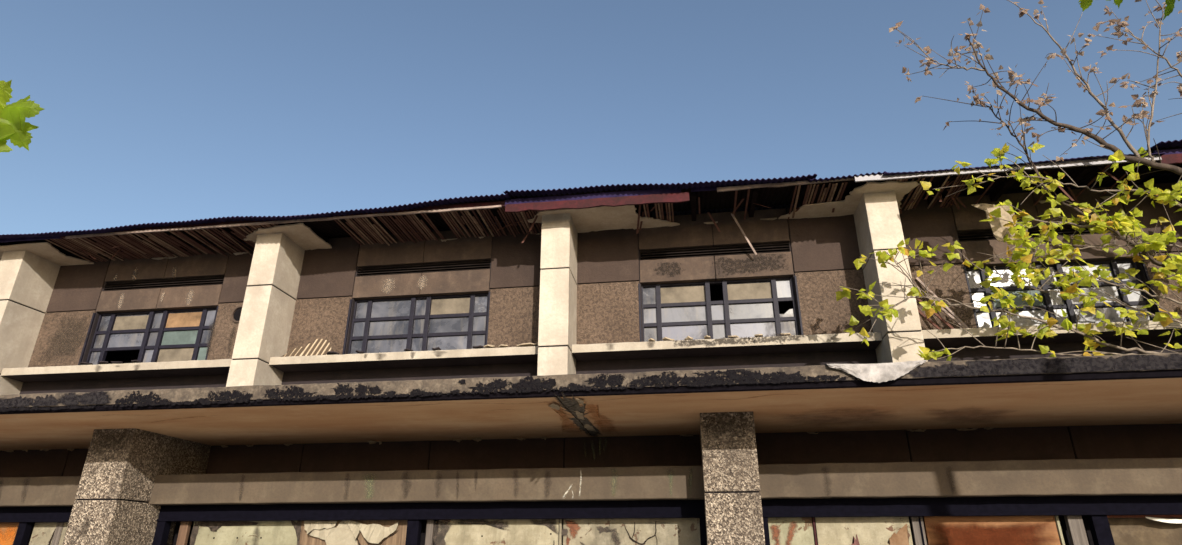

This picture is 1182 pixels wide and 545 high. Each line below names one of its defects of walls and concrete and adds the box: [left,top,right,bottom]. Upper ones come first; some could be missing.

damp [673,334,804,346]
damp [907,354,1182,378]
damp [0,369,862,412]
spalling [548,392,601,437]